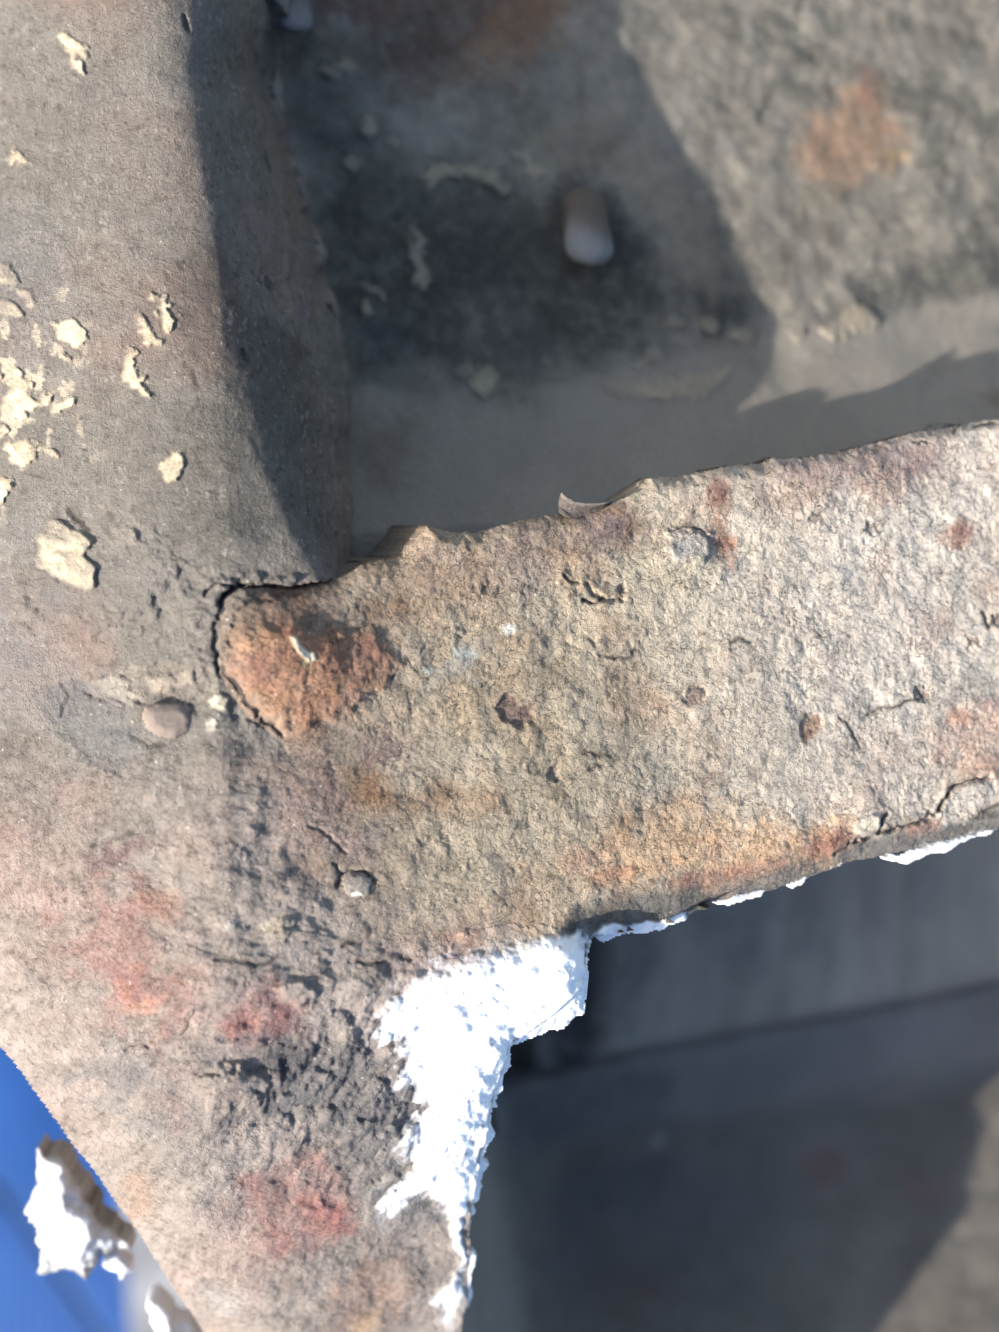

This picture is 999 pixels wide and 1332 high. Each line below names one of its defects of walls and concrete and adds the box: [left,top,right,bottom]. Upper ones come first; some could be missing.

rust [312,0,603,118]
damp [283,17,763,420]
peeling [121,291,175,399]
peeling [0,366,77,503]
peeling [158,450,185,483]
crack [205,582,281,734]
rust [554,787,870,915]
crack [836,776,999,853]
rust [33,830,319,1060]
damp [52,1035,197,1144]
damp [198,990,427,1223]
rust [231,1145,429,1332]